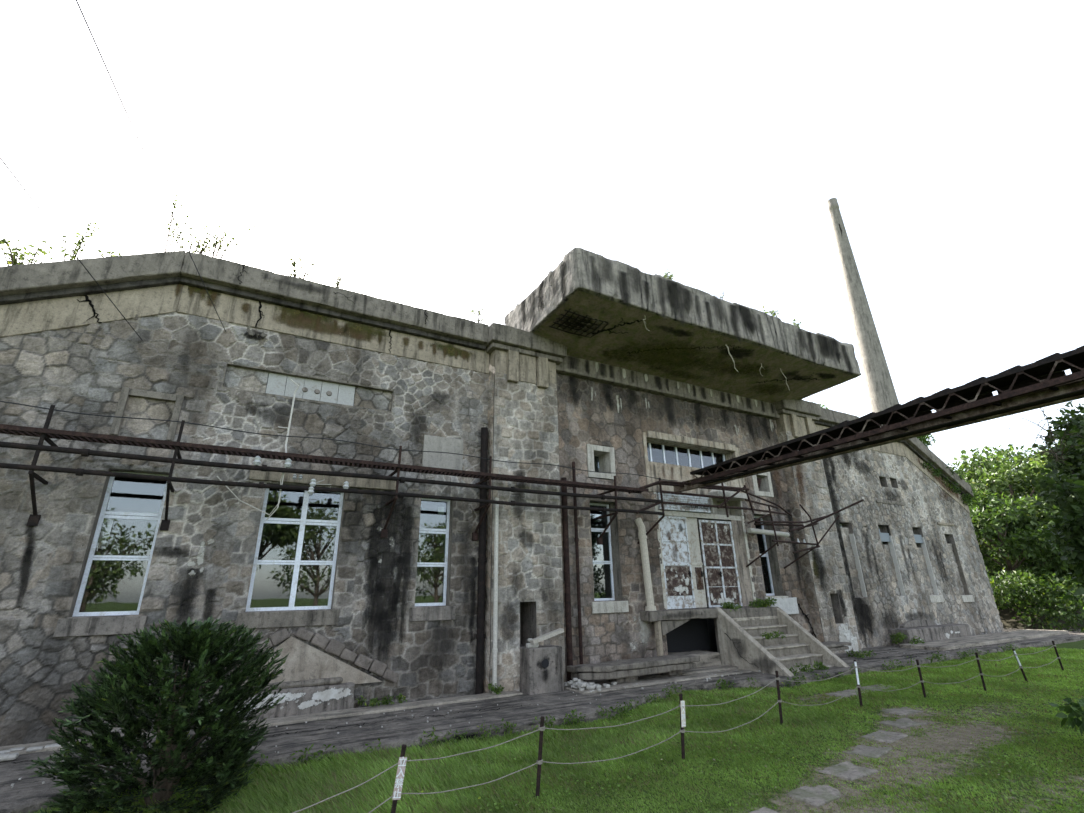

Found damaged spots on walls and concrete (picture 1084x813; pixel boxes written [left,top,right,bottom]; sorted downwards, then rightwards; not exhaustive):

crack [77,295,102,323]
crack [238,264,264,327]
water stain [522,262,566,327]
water stain [591,257,765,358]
water stain [365,490,412,658]
peeling [666,568,689,595]
peeling [711,592,736,604]
peeling [236,687,353,716]